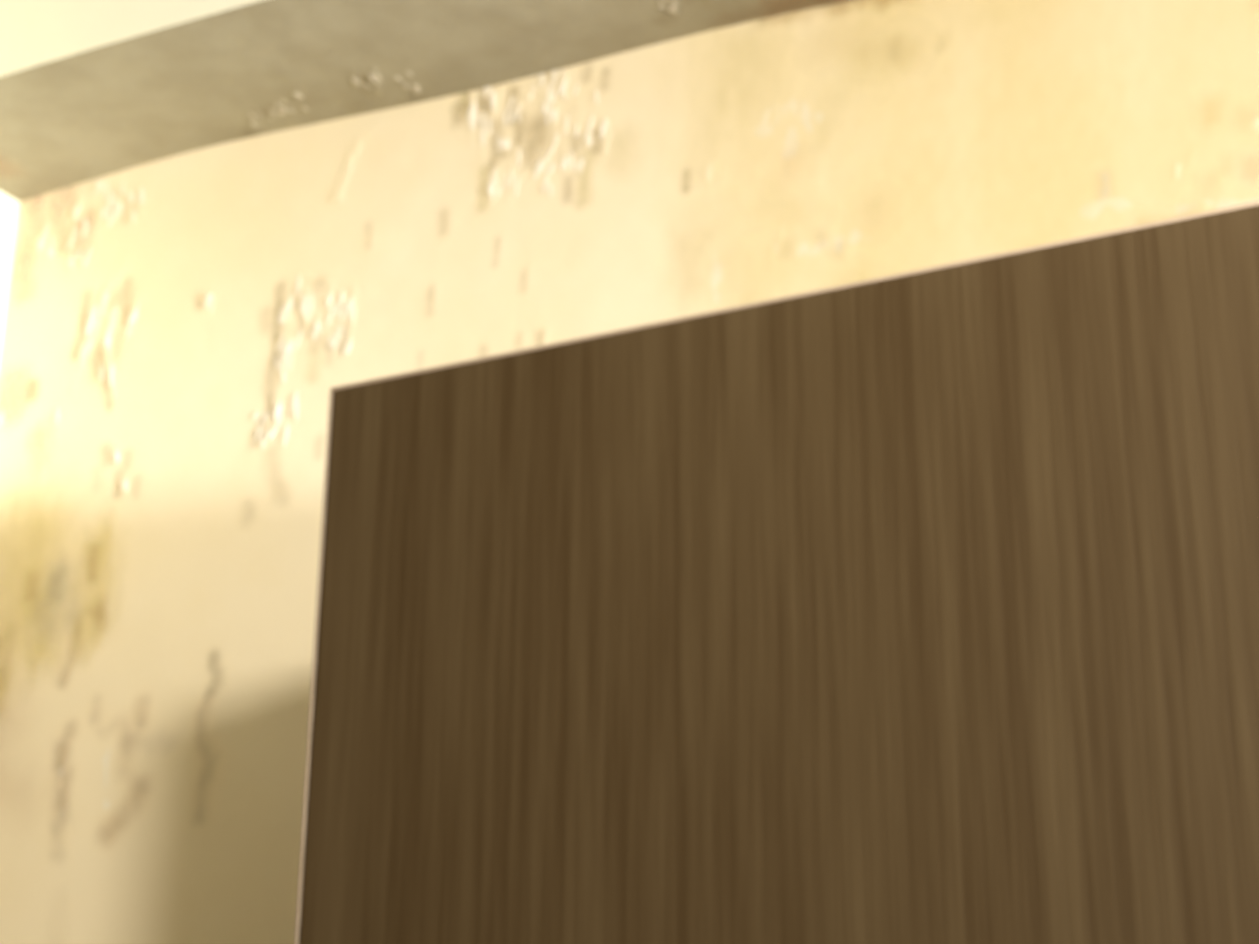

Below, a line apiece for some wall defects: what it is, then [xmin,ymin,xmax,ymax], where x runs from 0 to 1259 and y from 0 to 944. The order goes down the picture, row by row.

peeling [463,66,613,220]
peeling [56,276,142,425]
peeling [245,270,359,458]